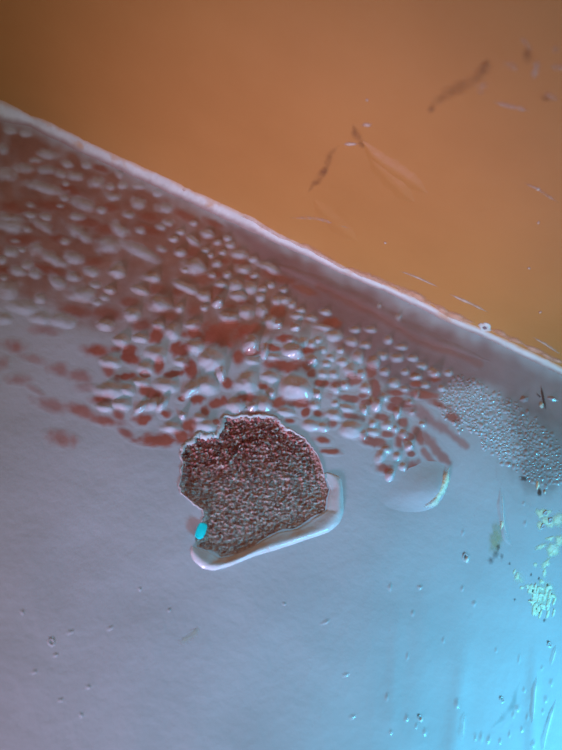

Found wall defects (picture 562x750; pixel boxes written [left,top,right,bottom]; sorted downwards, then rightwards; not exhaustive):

corrosion [0,121,480,480]
flaking render [178,413,344,571]